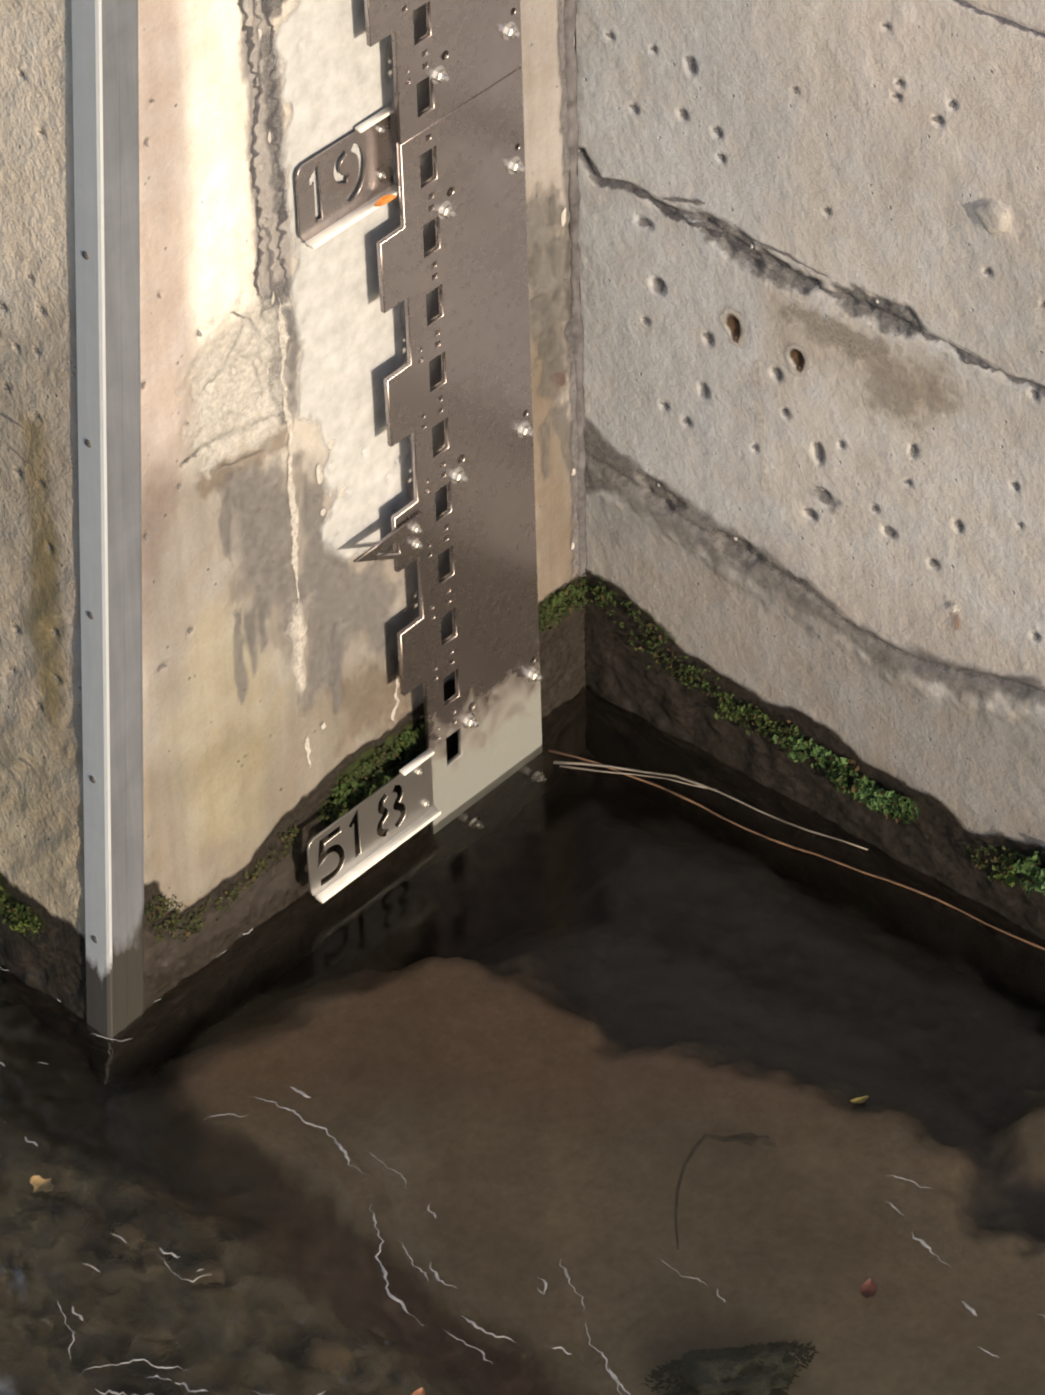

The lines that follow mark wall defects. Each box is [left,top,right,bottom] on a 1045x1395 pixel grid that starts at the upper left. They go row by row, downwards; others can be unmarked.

crack [238,0,290,378]
leakage [263,36,288,212]
crack [558,0,1045,395]
leakage [143,675,426,1010]
leakage [222,281,394,767]
leakage [443,678,456,702]
leakage [446,731,458,761]
crack [565,318,590,574]
leakage [538,570,1045,939]
leakage [584,424,1045,704]
crack [738,545,906,653]
crack [966,669,1045,692]